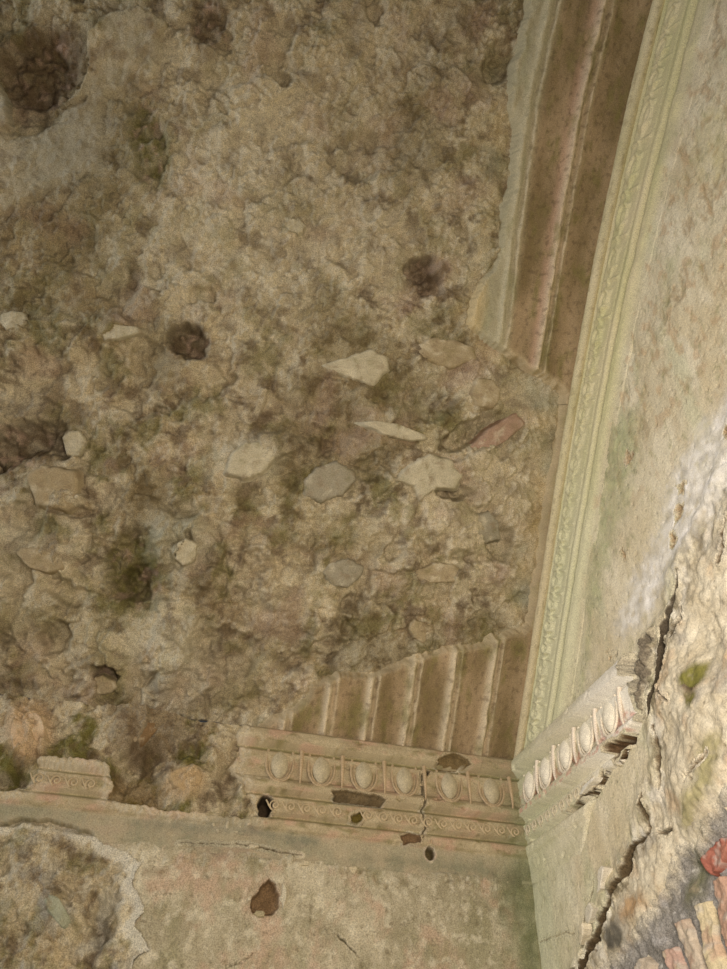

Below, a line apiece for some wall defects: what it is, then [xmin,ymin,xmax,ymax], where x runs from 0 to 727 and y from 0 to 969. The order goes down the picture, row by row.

spalling [0,17,87,127]
spalling [182,0,236,60]
spalling [122,96,176,197]
spalling [0,419,79,480]
leakage [616,399,727,633]
spalling [97,530,176,619]
spalling [615,622,661,723]
spalling [0,692,257,819]
spalling [432,752,474,774]
crack [539,565,709,969]
spalling [0,820,150,969]
spalling [247,875,287,920]